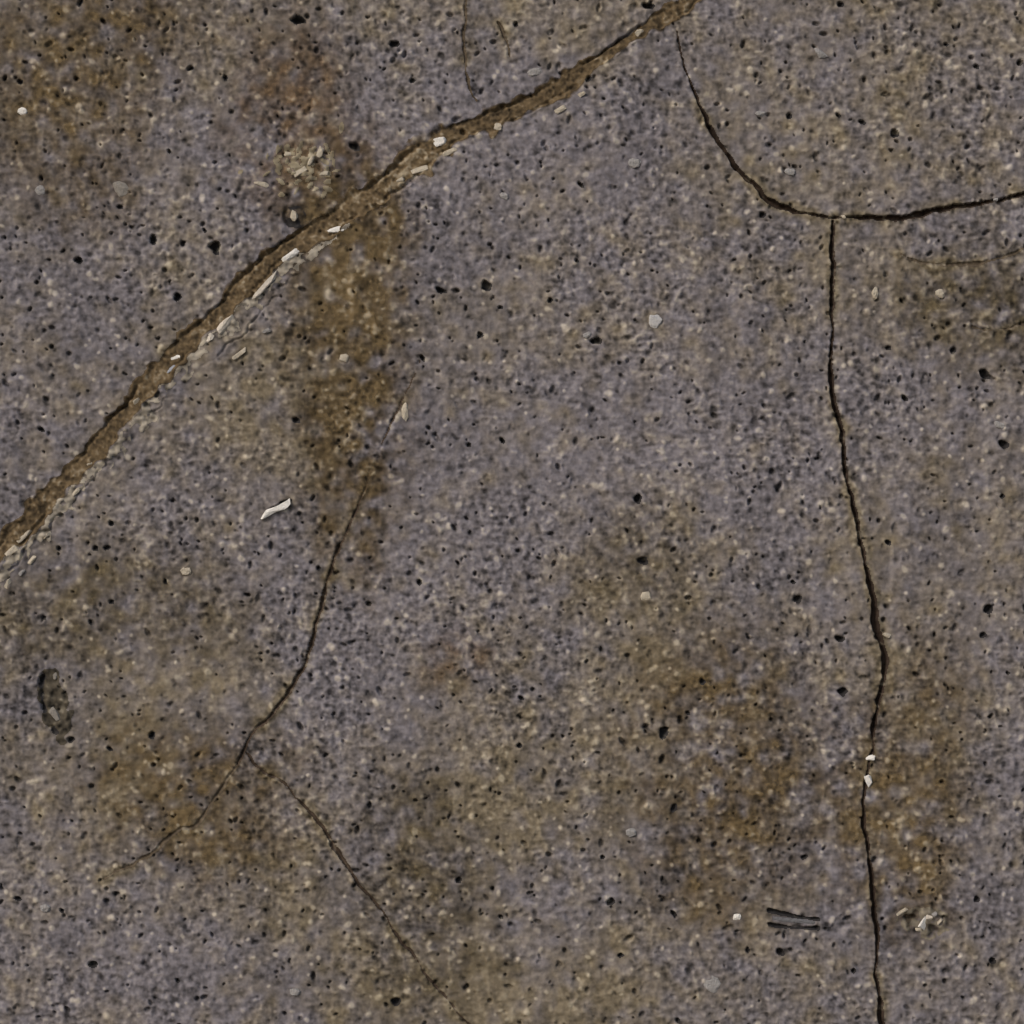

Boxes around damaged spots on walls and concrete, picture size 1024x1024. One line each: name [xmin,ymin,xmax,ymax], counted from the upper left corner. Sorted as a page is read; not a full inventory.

crack [103,476,470,1024]
crack [0,0,702,589]
crack [676,30,1024,1024]